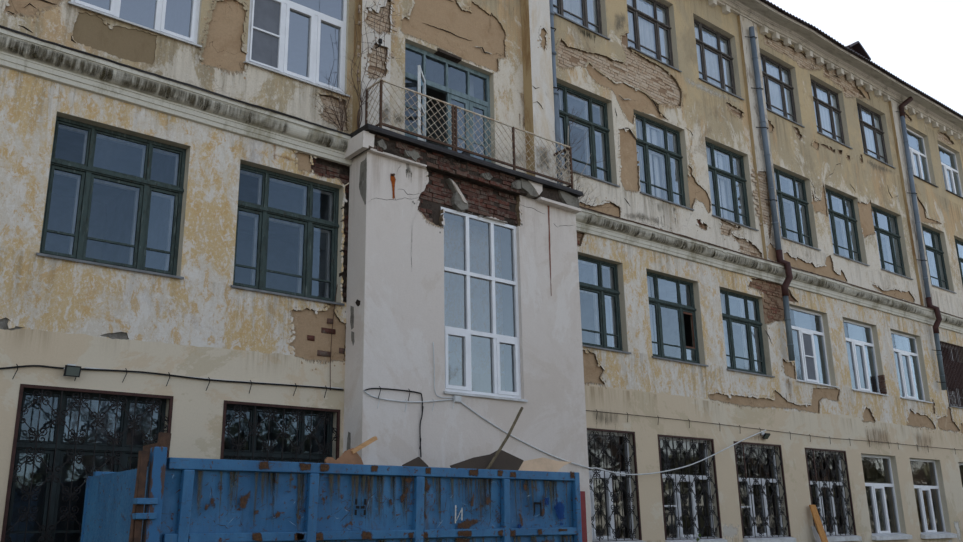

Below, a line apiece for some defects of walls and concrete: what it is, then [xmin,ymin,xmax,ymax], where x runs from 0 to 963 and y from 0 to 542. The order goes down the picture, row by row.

water stain [0,37,210,111]
flaking render [198,0,249,79]
flaking render [357,0,510,83]
flaking render [537,26,683,195]
spalling [281,130,523,371]
flaking render [687,164,848,282]
peeling [0,315,25,330]
flaking render [747,277,798,329]
flaking render [583,348,606,387]
flaking render [708,386,842,414]
flaking render [859,404,876,427]
flaking render [906,398,963,435]